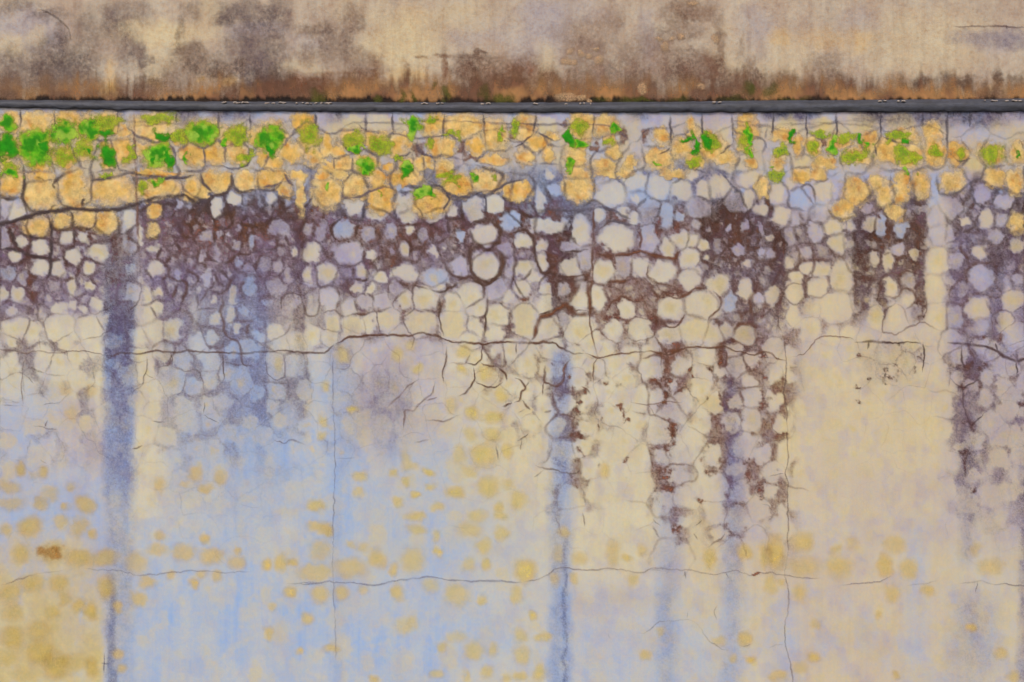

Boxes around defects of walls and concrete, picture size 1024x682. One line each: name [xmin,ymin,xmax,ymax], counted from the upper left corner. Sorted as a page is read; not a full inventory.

damp [0,36,1024,123]
crack [0,114,925,432]
damp [0,168,928,463]
damp [651,418,673,491]
damp [950,178,1024,432]
crack [954,343,1024,426]